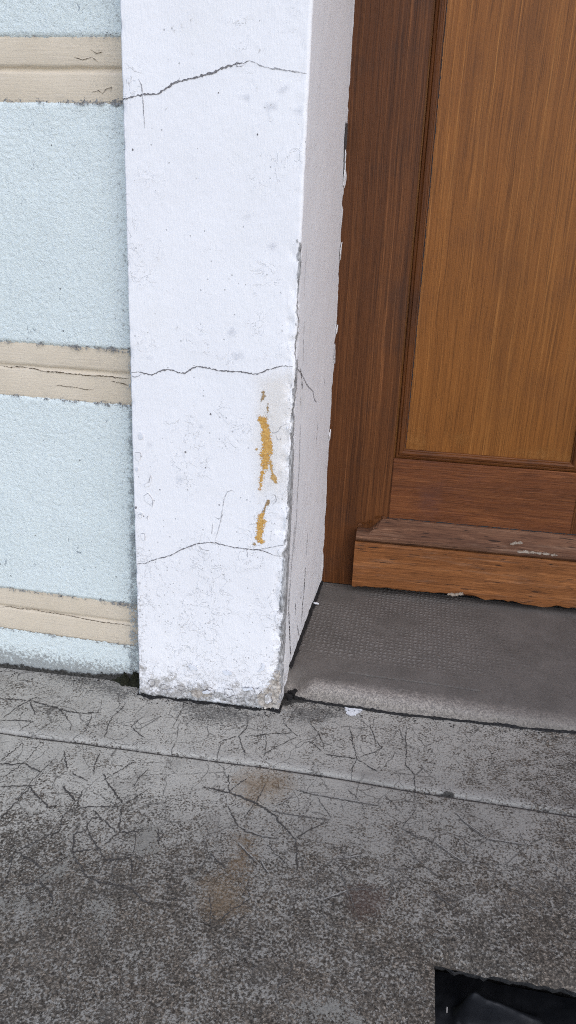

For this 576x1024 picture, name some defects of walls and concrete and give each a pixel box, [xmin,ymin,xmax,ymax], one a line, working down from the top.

crack [93,61,307,127]
crack [2,350,325,403]
crack [138,423,318,653]
corrosion [253,391,277,545]
crack [0,697,183,905]
crack [202,719,543,931]
crack [209,891,254,974]